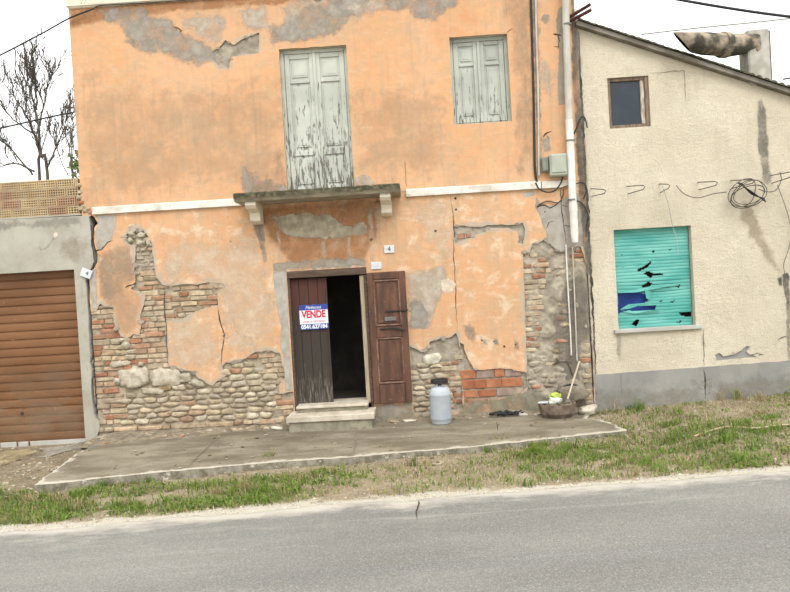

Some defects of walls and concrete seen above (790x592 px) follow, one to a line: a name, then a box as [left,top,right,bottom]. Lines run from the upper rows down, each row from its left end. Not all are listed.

peeling [105,0,456,69]
peeling [271,212,373,241]
crack [450,195,458,331]
flaking render [91,224,298,435]
crack [217,311,225,364]
flaking render [408,222,594,417]
flaking render [715,346,763,361]
damp [778,273,790,353]